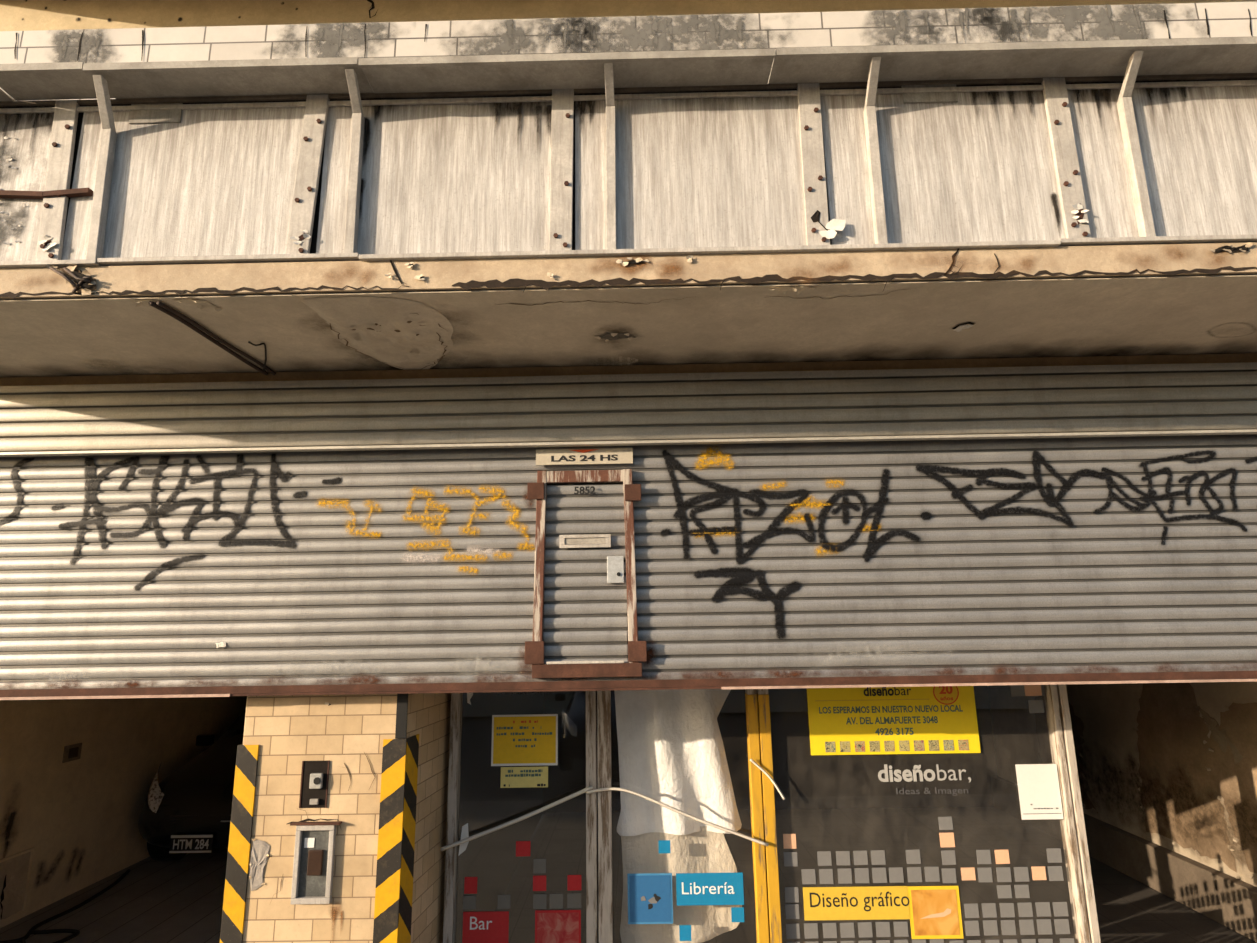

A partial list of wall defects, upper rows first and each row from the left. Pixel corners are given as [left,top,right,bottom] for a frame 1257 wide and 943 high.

leakage [272,22,394,58]
leakage [453,13,784,56]
leakage [871,3,1170,46]
crack [0,260,409,299]
crack [452,248,1257,306]
leakage [1075,750,1257,865]